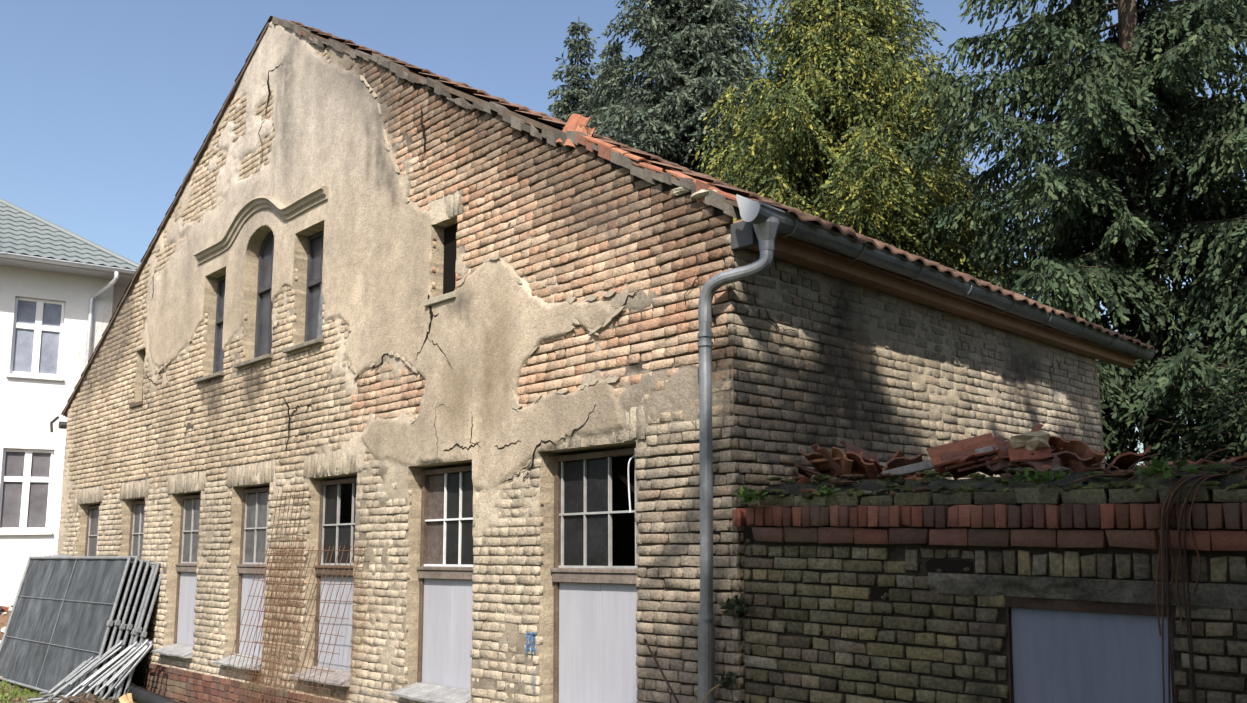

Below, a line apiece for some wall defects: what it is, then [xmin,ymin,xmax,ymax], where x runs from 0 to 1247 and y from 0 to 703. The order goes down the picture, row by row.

crack [258,63,283,171]
spalling [360,68,737,412]
crack [374,294,452,368]
crack [434,403,596,483]